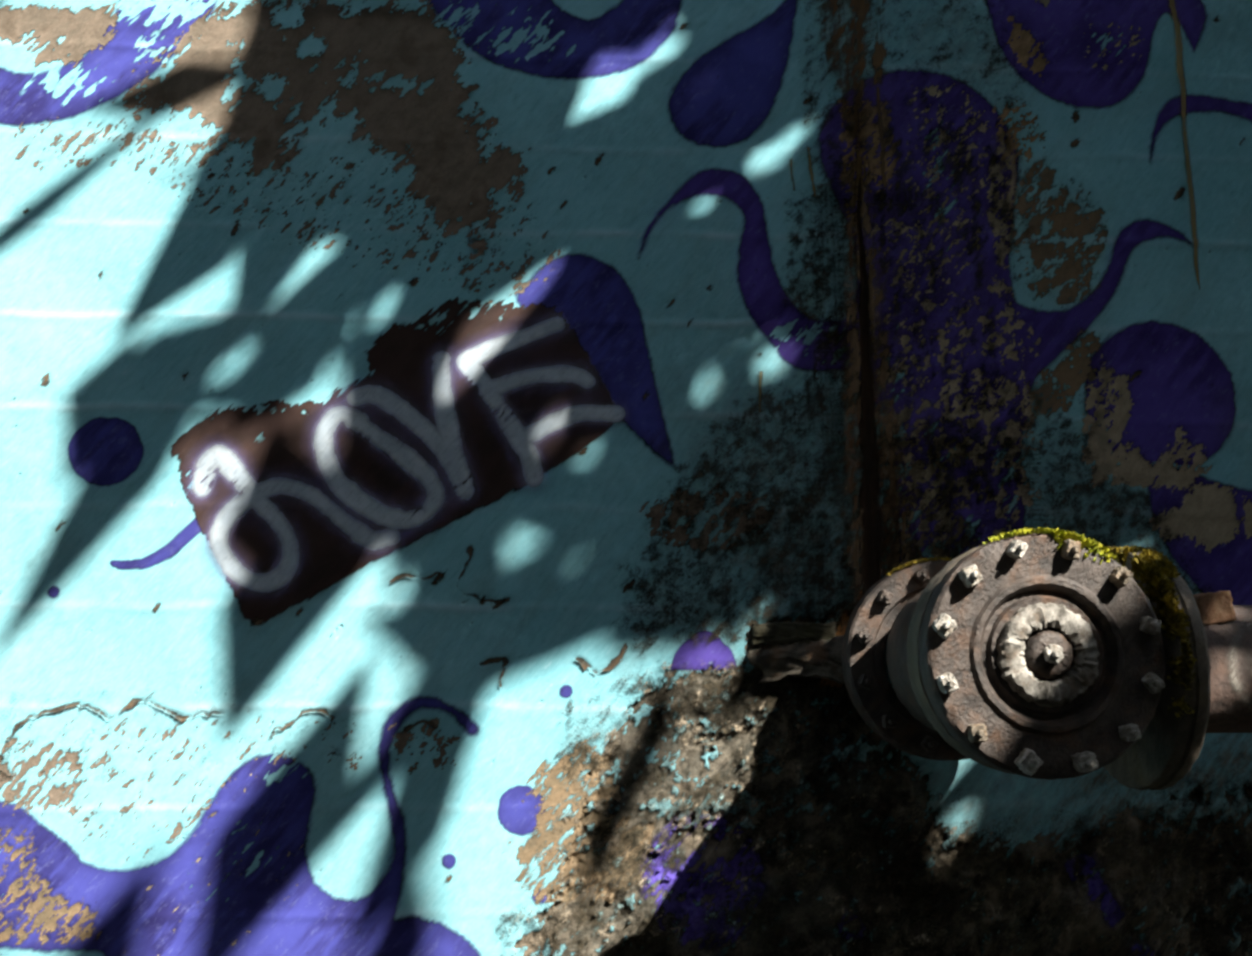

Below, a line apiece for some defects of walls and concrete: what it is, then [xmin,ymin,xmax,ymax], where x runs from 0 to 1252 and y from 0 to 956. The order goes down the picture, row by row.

peeling [0,0,564,306]
rust [821,0,887,146]
peeling [0,711,273,945]
peeling [388,717,460,775]
water stain [496,661,1252,956]